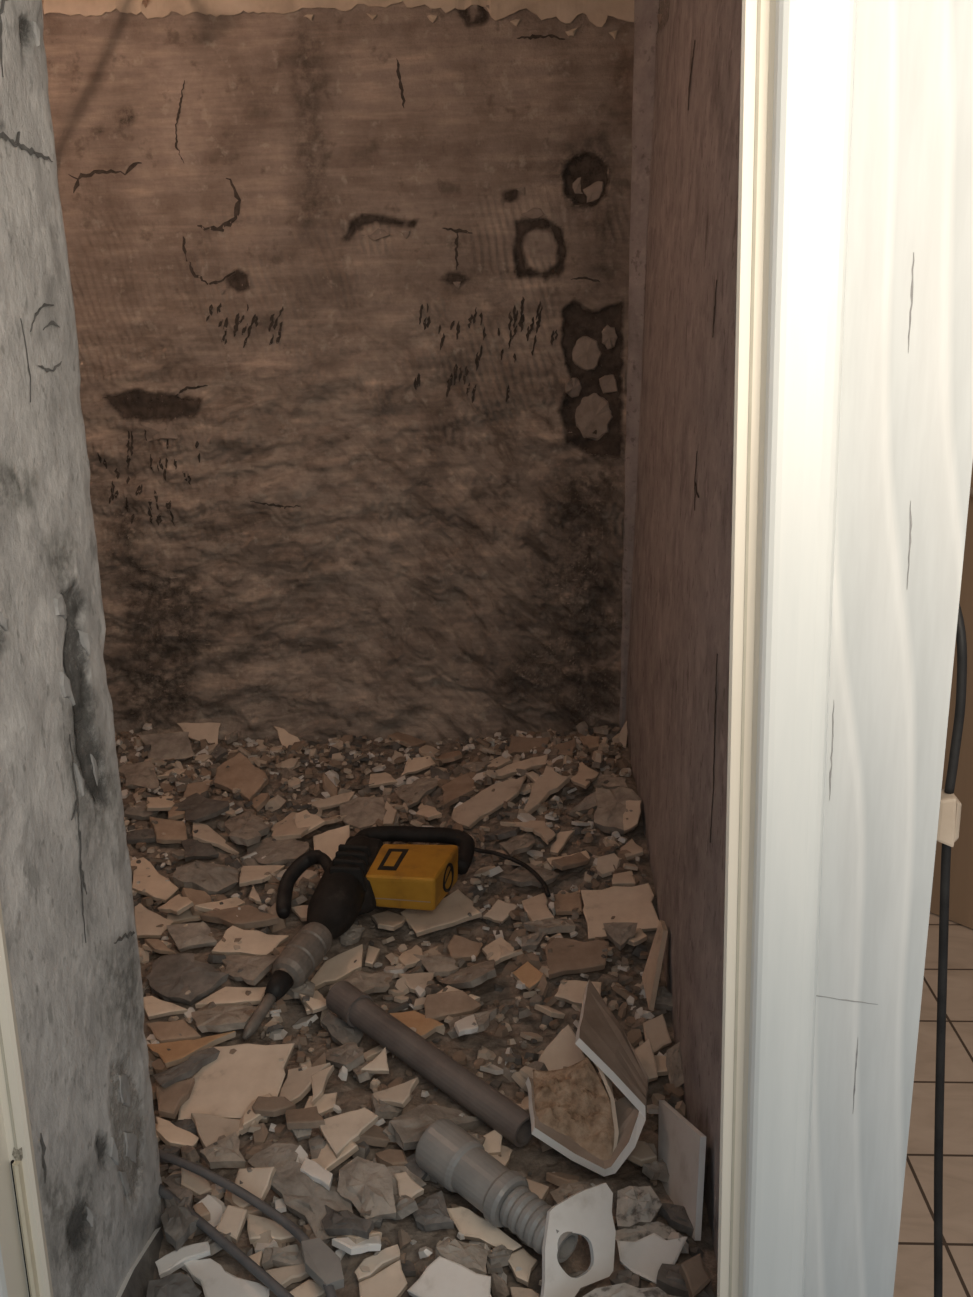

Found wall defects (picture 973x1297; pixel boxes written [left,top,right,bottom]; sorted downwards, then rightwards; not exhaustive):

crack [0,0,8,77]
flaking render [19,0,634,46]
crack [0,132,142,193]
crack [175,80,185,163]
spalling [563,152,609,207]
crack [182,178,241,285]
crack [442,228,472,270]
spalling [504,187,566,278]
crack [20,303,62,402]
spalling [419,297,624,458]
spalling [97,389,202,526]
leakage [124,568,210,725]